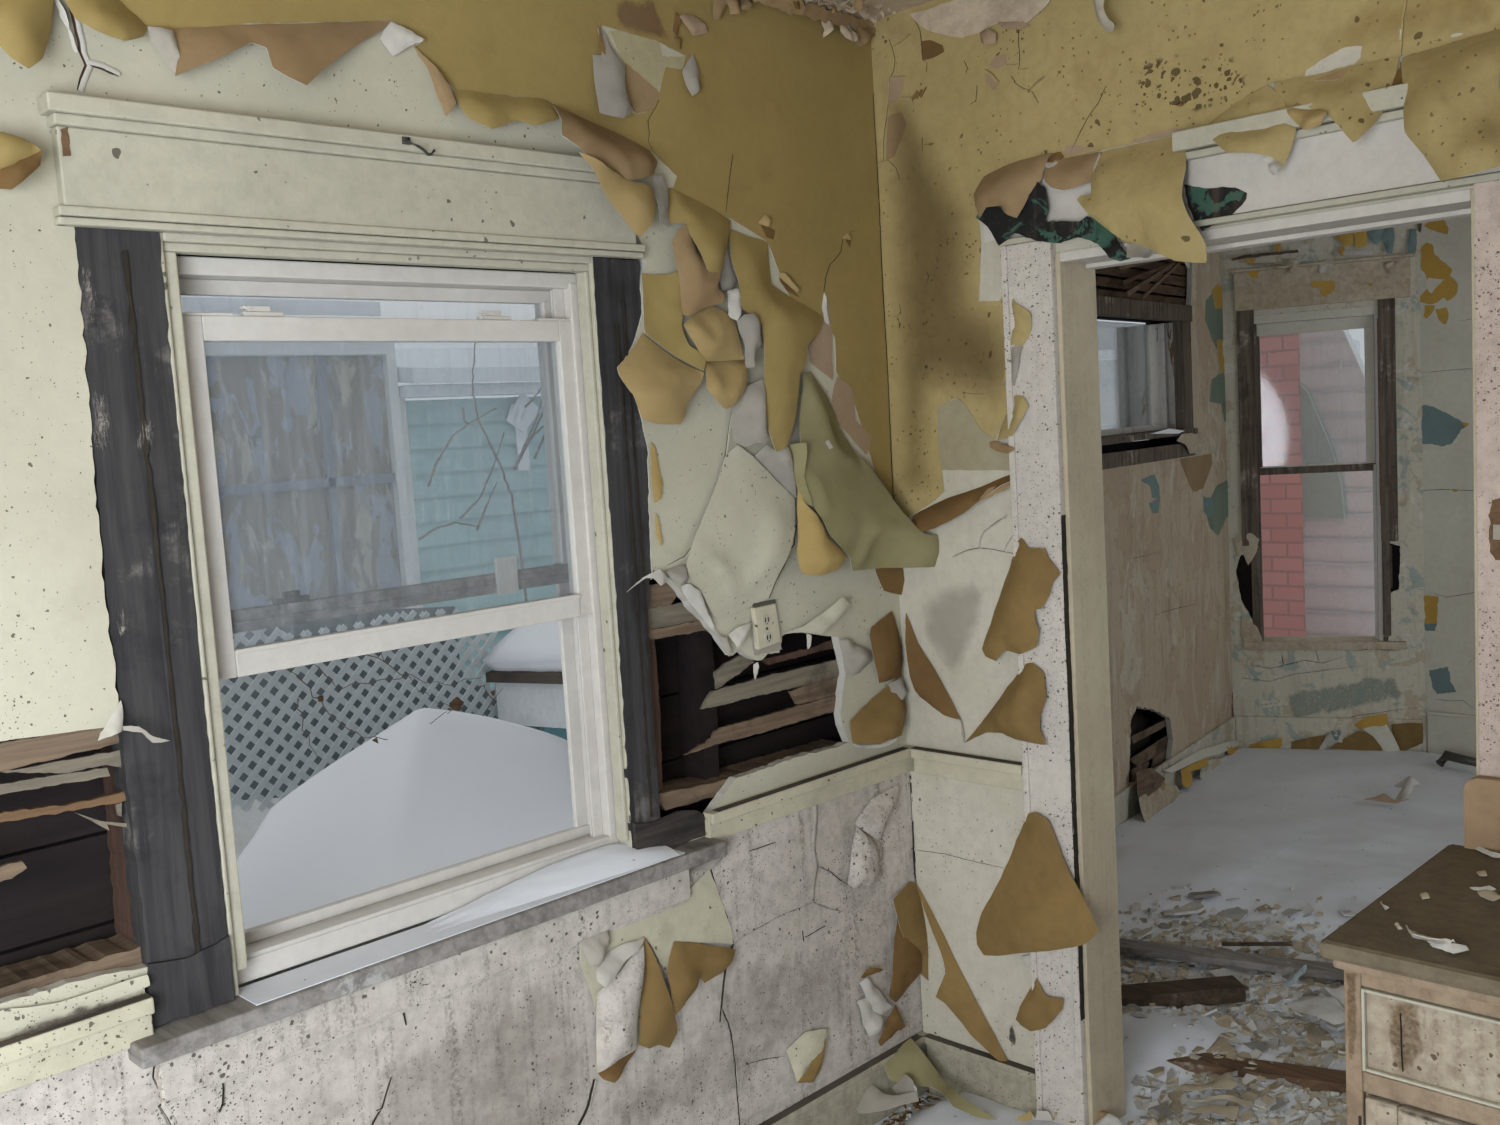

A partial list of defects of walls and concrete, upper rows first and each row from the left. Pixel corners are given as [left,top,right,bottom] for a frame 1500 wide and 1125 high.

crack [69,9,120,92]
peeling [593,0,1051,118]
peeling [1274,220,1458,324]
flaking render [937,398,1010,471]
peeling [1418,380,1469,446]
peeling [1423,595,1439,631]
hole [627,565,871,810]
peeling [1429,667,1456,694]
hole [1129,711,1168,782]
hole [0,700,170,1033]
crack [371,1077,393,1125]
crack [578,1079,596,1125]